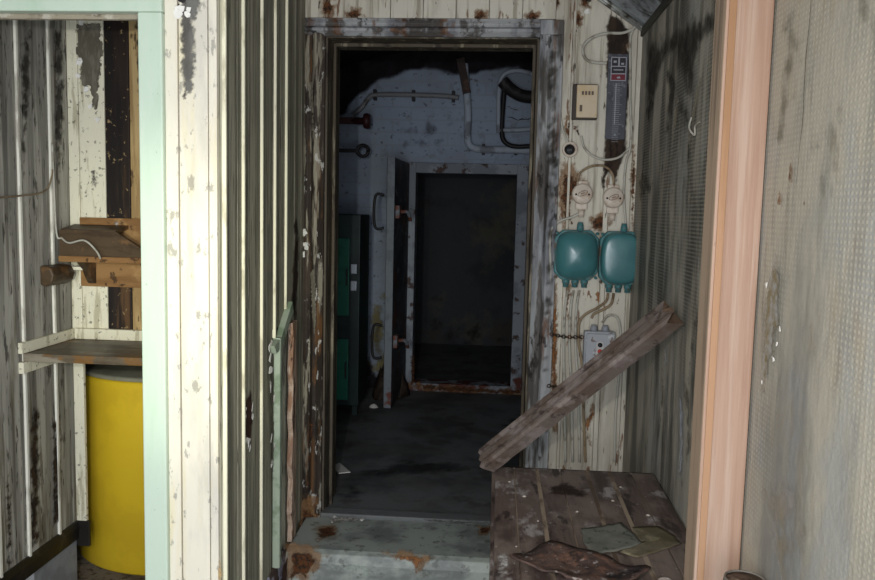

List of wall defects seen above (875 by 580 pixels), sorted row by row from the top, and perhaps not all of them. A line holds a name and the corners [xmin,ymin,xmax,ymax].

peeling [173,0,191,19]
corrosion [323,0,335,18]
peeling [75,20,103,123]
damp [646,16,715,138]
corrosion [559,164,578,224]
corrosion [299,496,337,540]
corrosion [286,543,321,580]
corrosion [386,551,429,572]